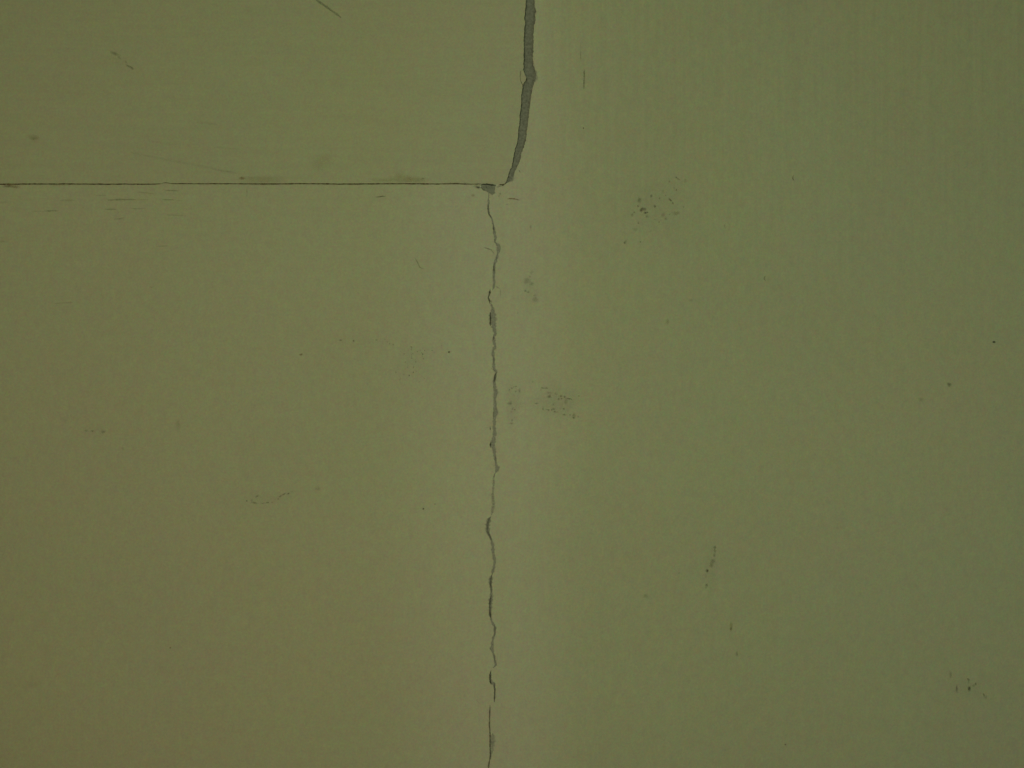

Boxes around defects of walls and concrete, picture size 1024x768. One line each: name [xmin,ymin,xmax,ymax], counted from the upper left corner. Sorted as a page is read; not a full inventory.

crack [0,0,536,477]
crack [486,517,497,766]